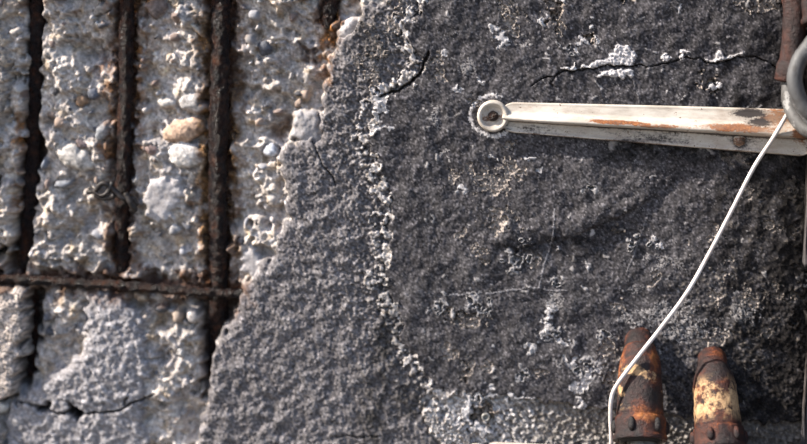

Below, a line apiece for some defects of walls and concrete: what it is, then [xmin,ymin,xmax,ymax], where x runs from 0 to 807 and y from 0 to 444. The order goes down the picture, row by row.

rust [318,25,336,61]
crack [380,52,430,98]
crack [532,44,775,103]
rust [12,117,26,150]
spalling [0,0,623,444]
crack [0,394,155,421]
spalling [662,412,695,444]
spalling [741,420,802,444]